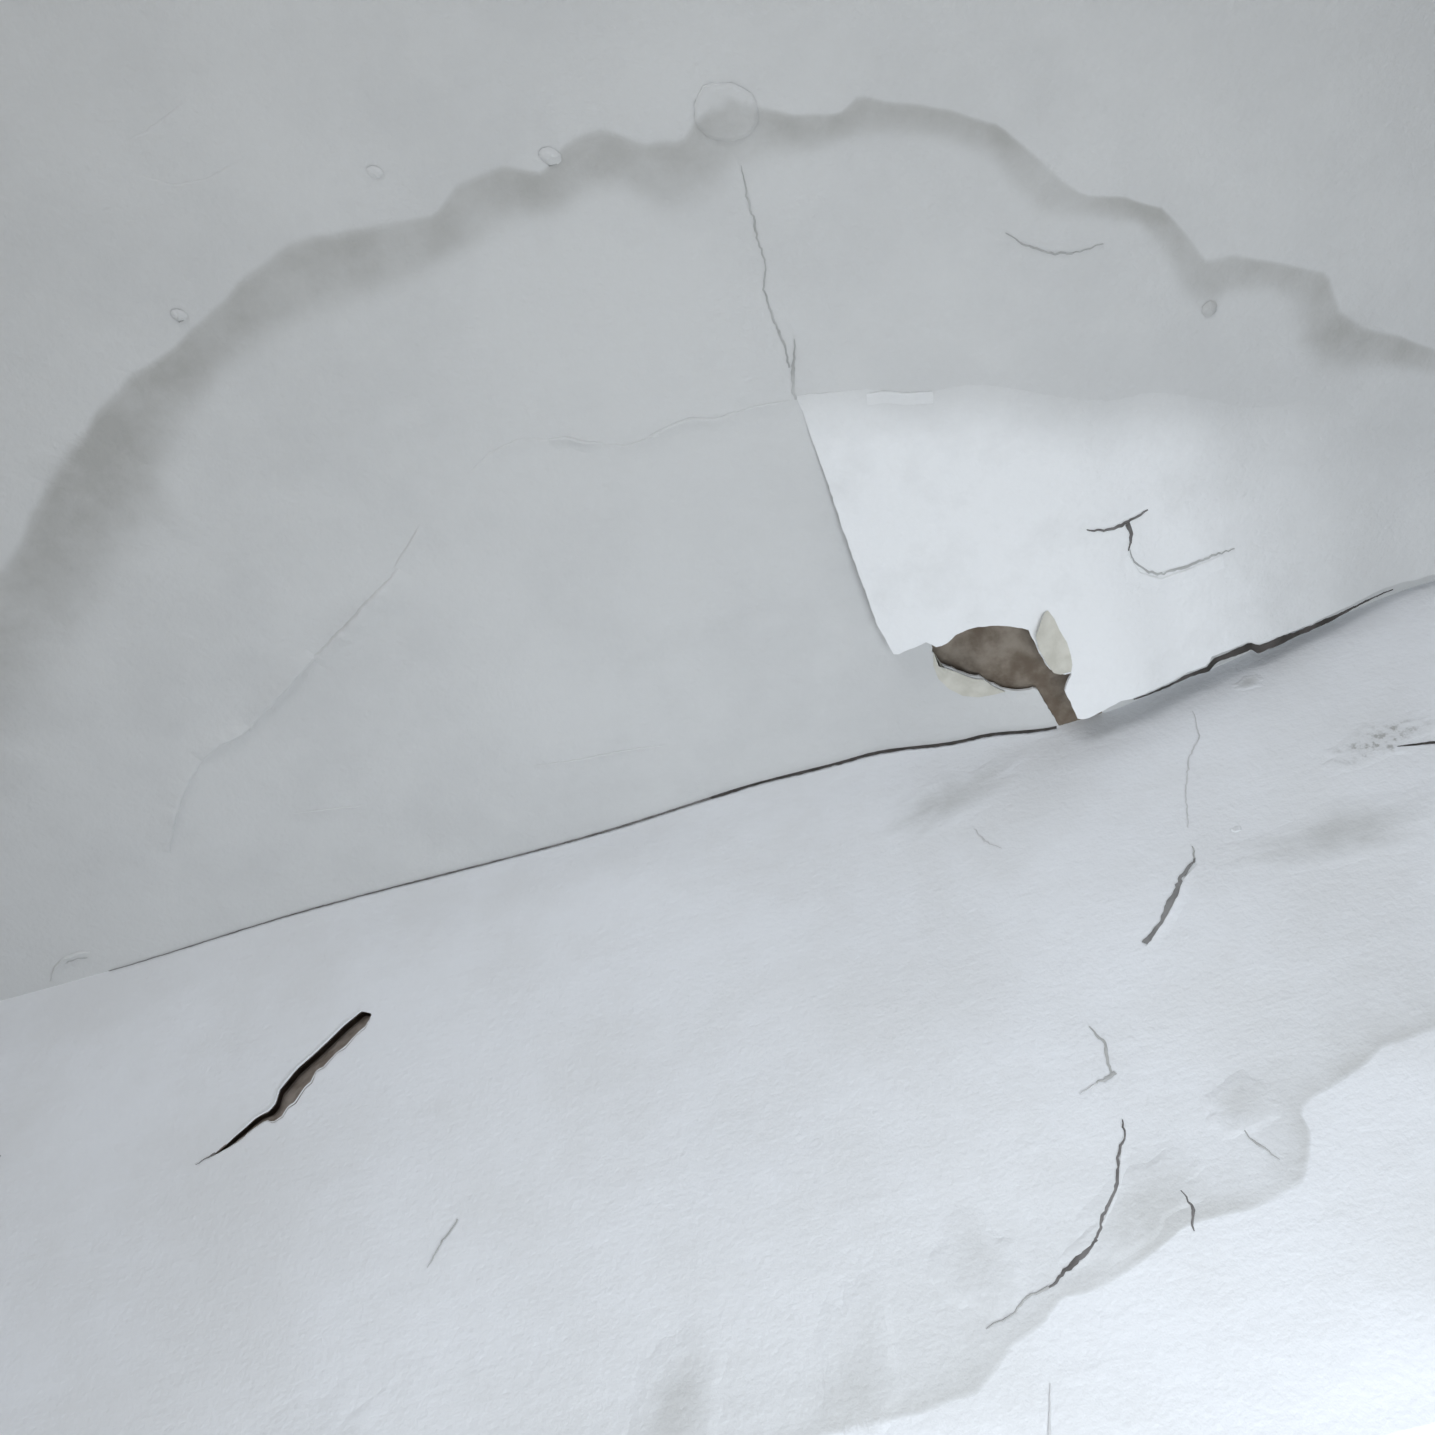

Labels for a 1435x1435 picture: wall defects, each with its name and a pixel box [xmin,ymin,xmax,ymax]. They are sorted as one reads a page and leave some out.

crack [741,165,797,400]
leakage [0,94,1435,828]
flaking render [797,385,1435,719]
crack [1087,509,1235,593]
leakage [862,747,1035,850]
crack [1142,711,1205,950]
leakage [1210,783,1435,878]
crack [986,1119,1135,1329]